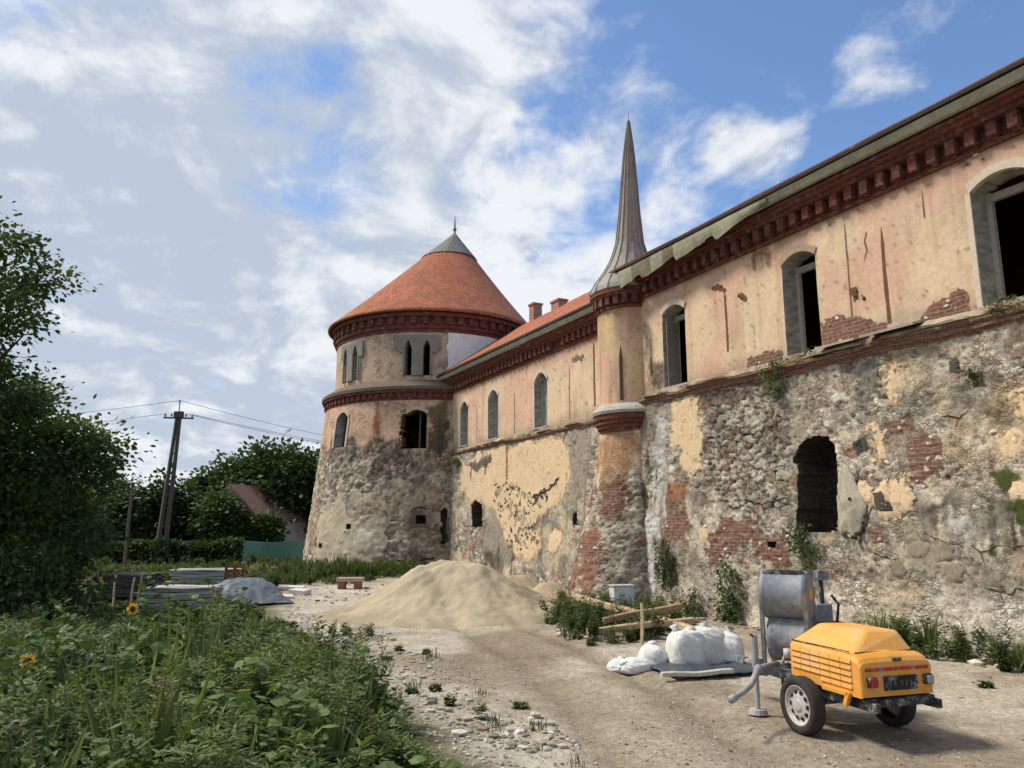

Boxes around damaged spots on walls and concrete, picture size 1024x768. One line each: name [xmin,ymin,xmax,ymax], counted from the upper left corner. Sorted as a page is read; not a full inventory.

spalling [747,349,786,368]
spalling [820,314,887,346]
spalling [918,288,971,324]
peeling [313,493,389,567]
spalling [404,509,436,530]
peeling [458,435,572,565]
spalling [577,474,632,565]
spalling [662,504,792,573]
spalling [850,355,966,590]